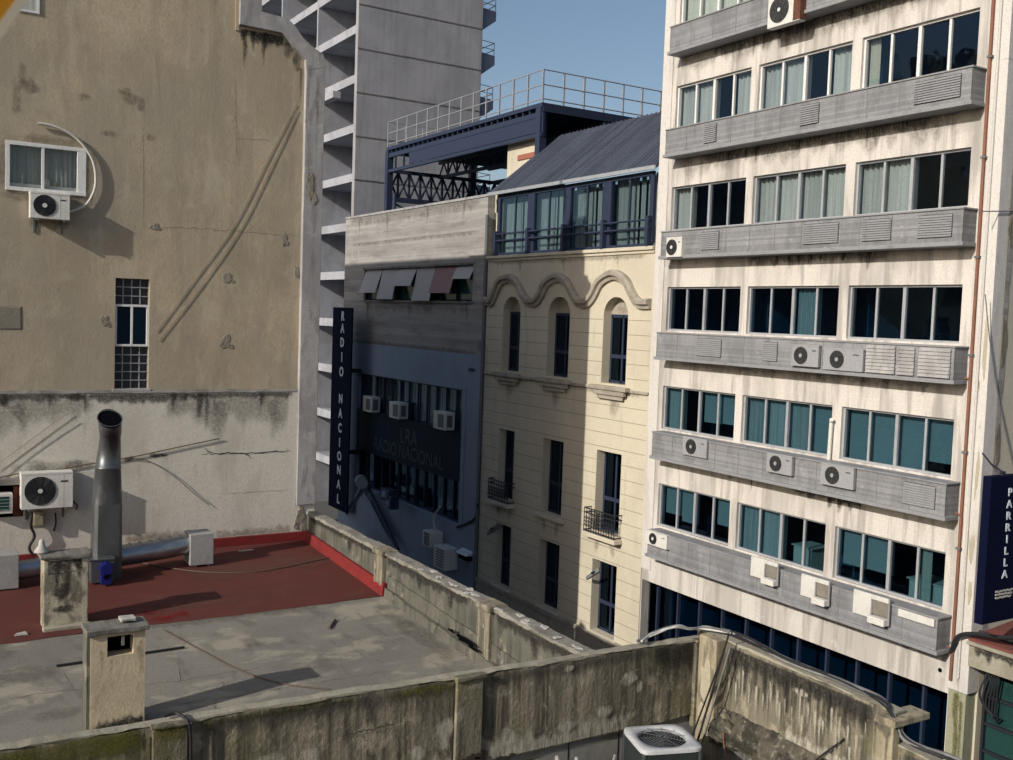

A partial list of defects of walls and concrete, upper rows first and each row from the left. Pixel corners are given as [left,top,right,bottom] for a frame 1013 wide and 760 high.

water stain [241,29,301,74]
water stain [0,392,291,414]
crack [202,448,290,459]
water stain [495,615,692,693]
water stain [724,648,889,760]
water stain [438,720,453,748]
water stain [489,707,627,760]